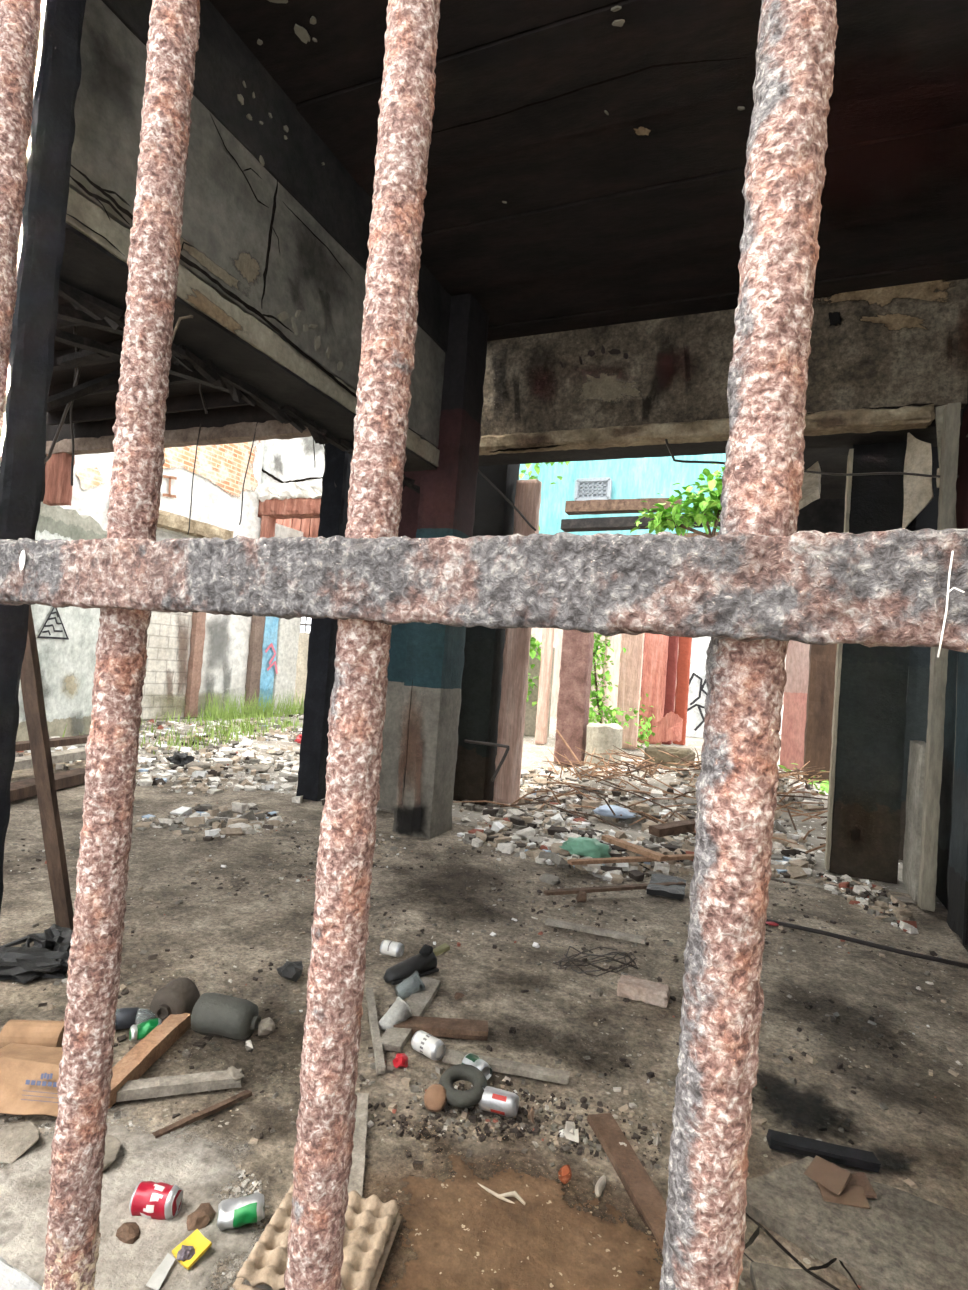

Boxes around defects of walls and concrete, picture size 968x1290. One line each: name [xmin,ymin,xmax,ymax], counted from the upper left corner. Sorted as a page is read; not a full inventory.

peeling [294,16,317,44]
crack [66,164,133,255]
crack [180,114,357,398]
corrosion [64,675,77,695]
corrosion [167,618,188,698]
corrosion [398,712,422,808]
crack [744,1213,860,1290]